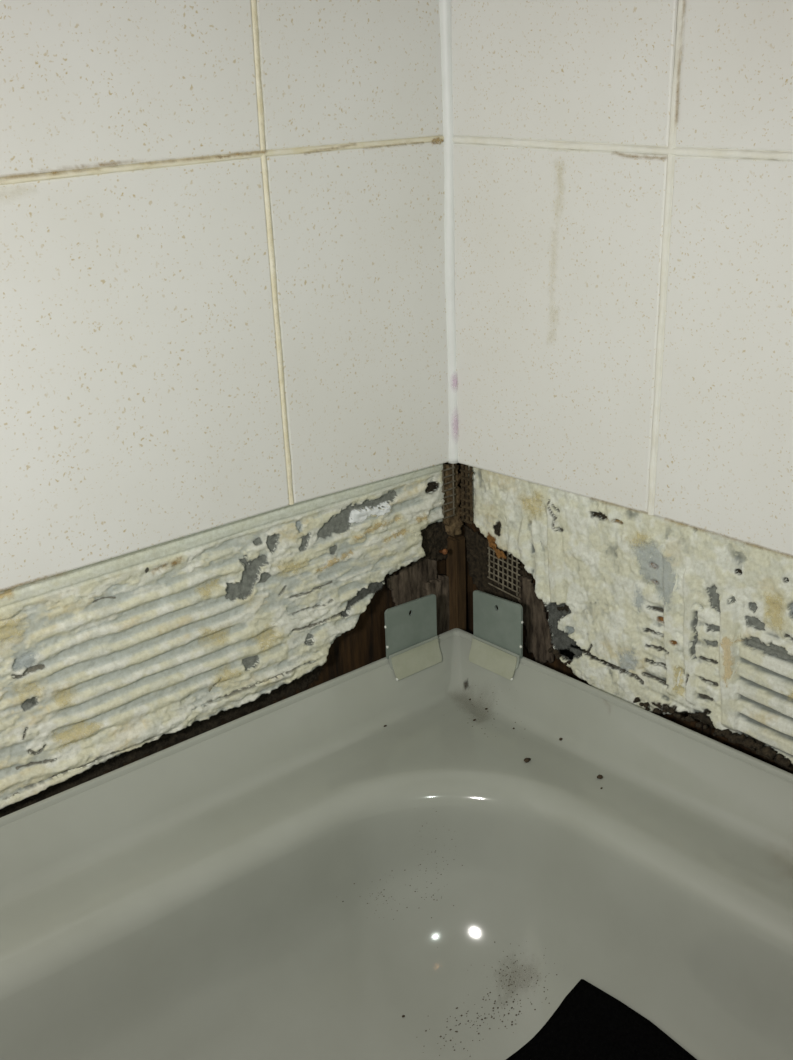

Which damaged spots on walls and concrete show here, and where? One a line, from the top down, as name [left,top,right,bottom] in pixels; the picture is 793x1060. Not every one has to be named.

spalling [296,490,397,554]
spalling [225,534,279,600]
spalling [340,580,384,617]
spalling [546,602,583,661]
spalling [746,603,793,660]
spalling [242,656,259,670]
spalling [21,697,38,711]